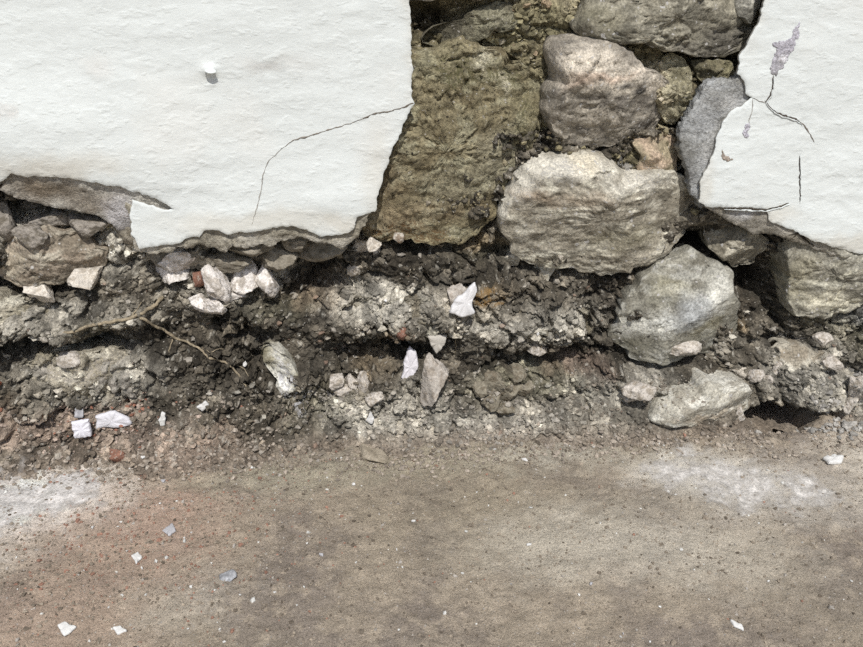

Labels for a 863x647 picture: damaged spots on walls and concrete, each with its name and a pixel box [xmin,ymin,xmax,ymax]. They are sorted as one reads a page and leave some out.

crack [251,103,413,226]
crack [724,75,814,212]
spalling [0,0,863,481]